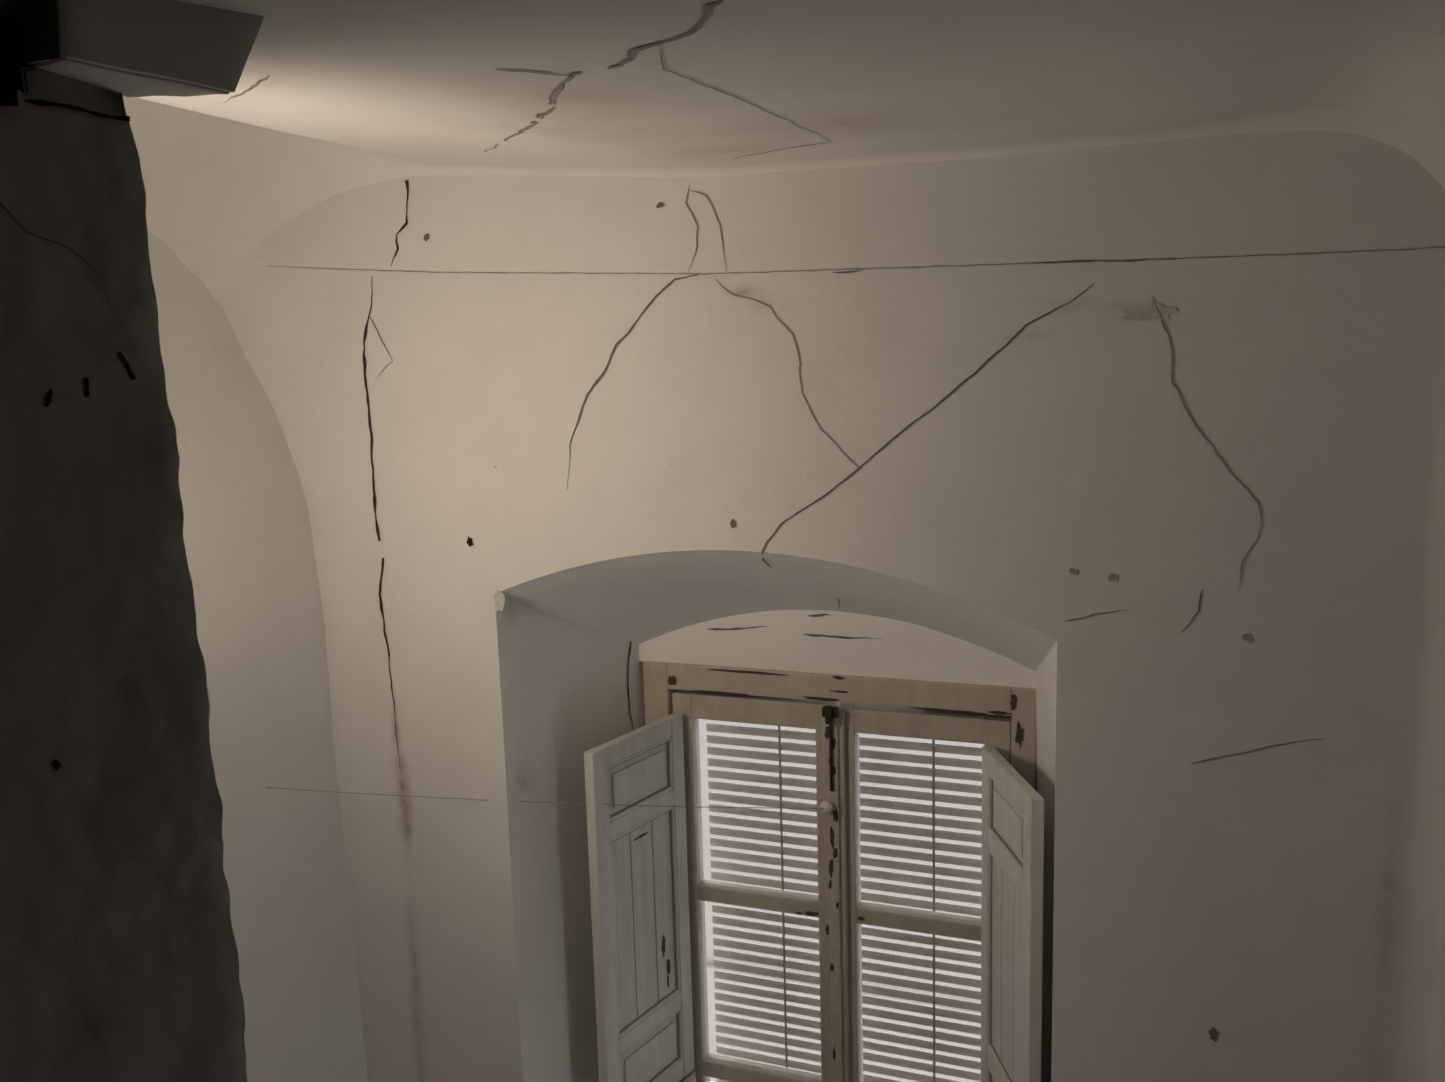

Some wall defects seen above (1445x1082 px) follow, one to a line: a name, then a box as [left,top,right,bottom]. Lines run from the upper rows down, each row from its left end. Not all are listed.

crack [484,0,830,159]
crack [271,180,1445,764]